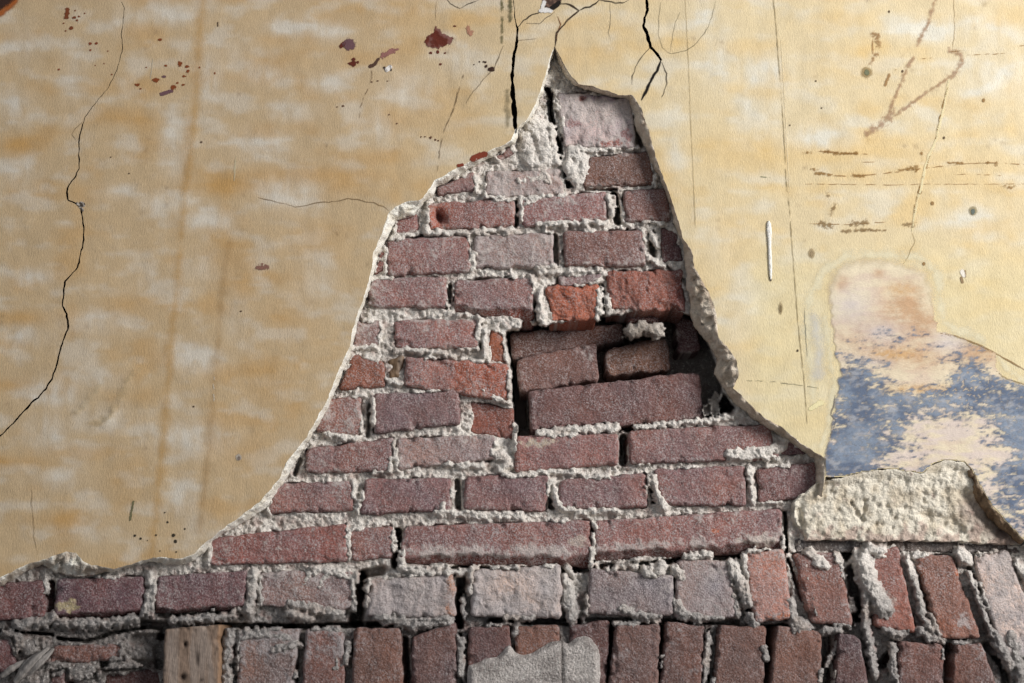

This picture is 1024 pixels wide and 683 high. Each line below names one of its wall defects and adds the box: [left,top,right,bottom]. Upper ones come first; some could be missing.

peeling [339,39,399,82]
crack [494,0,713,132]
crack [0,2,125,436]
flaking render [0,46,842,623]
peeling [790,250,1024,555]